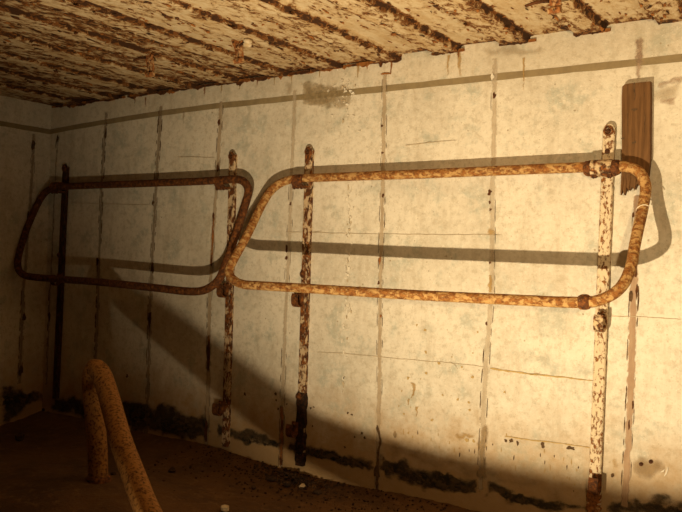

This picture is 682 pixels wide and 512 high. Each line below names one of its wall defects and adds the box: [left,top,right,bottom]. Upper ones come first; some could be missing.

rust [52,44,402,108]
damp [2,386,43,422]
mould [122,401,209,440]
damp [230,429,280,447]
damp [305,446,477,493]
damp [635,460,668,476]
mould [489,482,579,511]
damp [608,494,682,512]